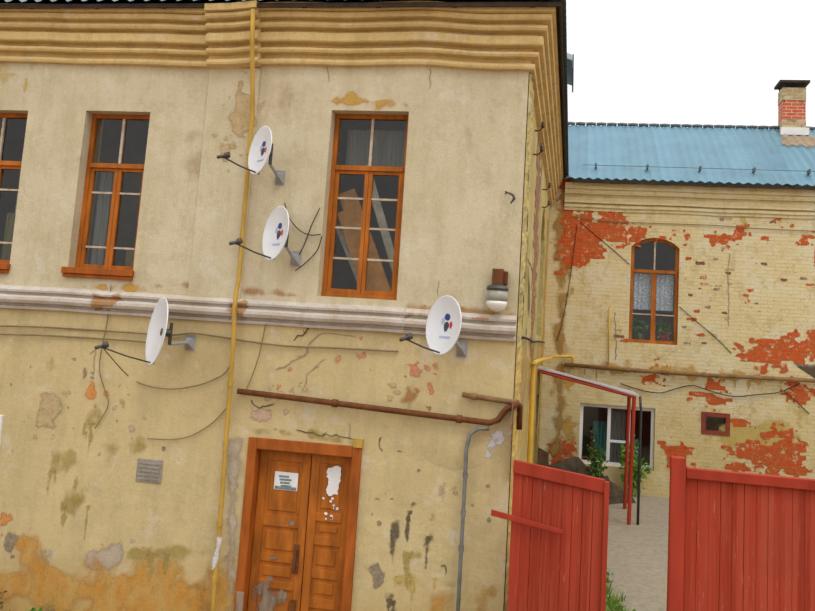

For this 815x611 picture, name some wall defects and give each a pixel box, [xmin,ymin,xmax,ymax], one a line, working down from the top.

flaking render [212,72,257,172]
flaking render [530,138,542,369]
flaking render [554,177,652,276]
flaking render [703,217,769,260]
flaking render [33,390,71,439]
crack [276,328,358,392]
spalling [404,361,439,394]
flaking render [657,437,696,468]
flaking render [686,373,813,477]
flaking render [732,329,815,407]
leakage [0,438,243,611]
leakage [390,510,415,599]